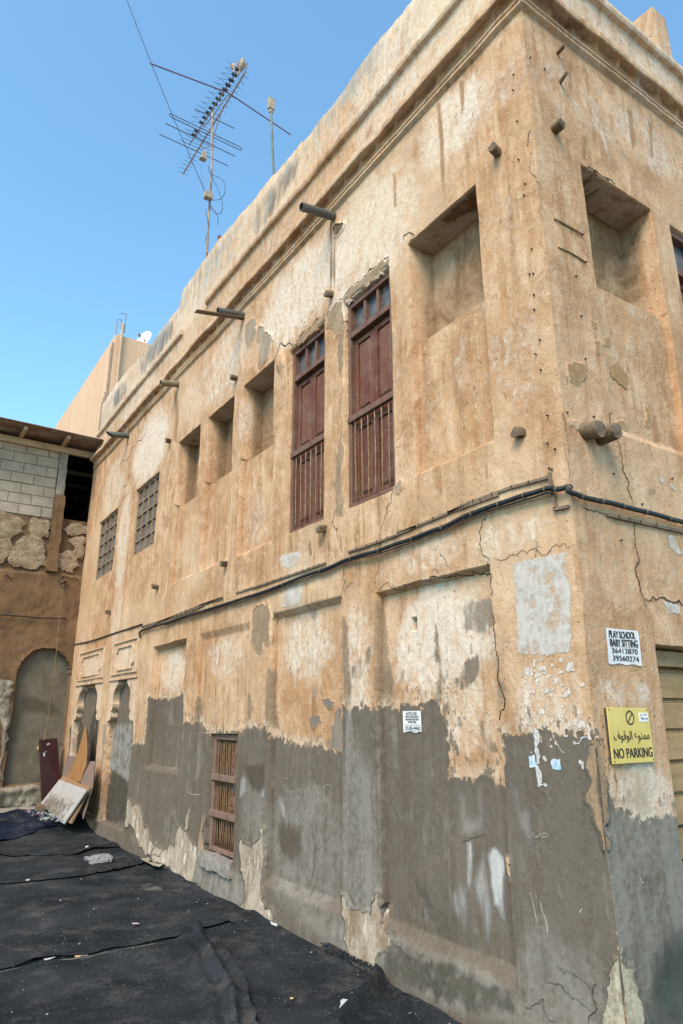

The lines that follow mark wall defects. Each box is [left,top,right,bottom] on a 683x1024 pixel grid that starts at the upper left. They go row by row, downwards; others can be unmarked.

peeling [245,316,274,369]
spalling [289,257,391,517]
peeling [565,360,587,387]
peeling [610,363,629,389]
crack [609,413,683,606]
peeling [251,584,302,655]
crack [375,490,573,735]
peeling [513,553,612,854]
peeling [124,796,213,882]
peeling [238,823,277,924]
peeling [340,888,395,972]
spalling [598,947,646,1024]